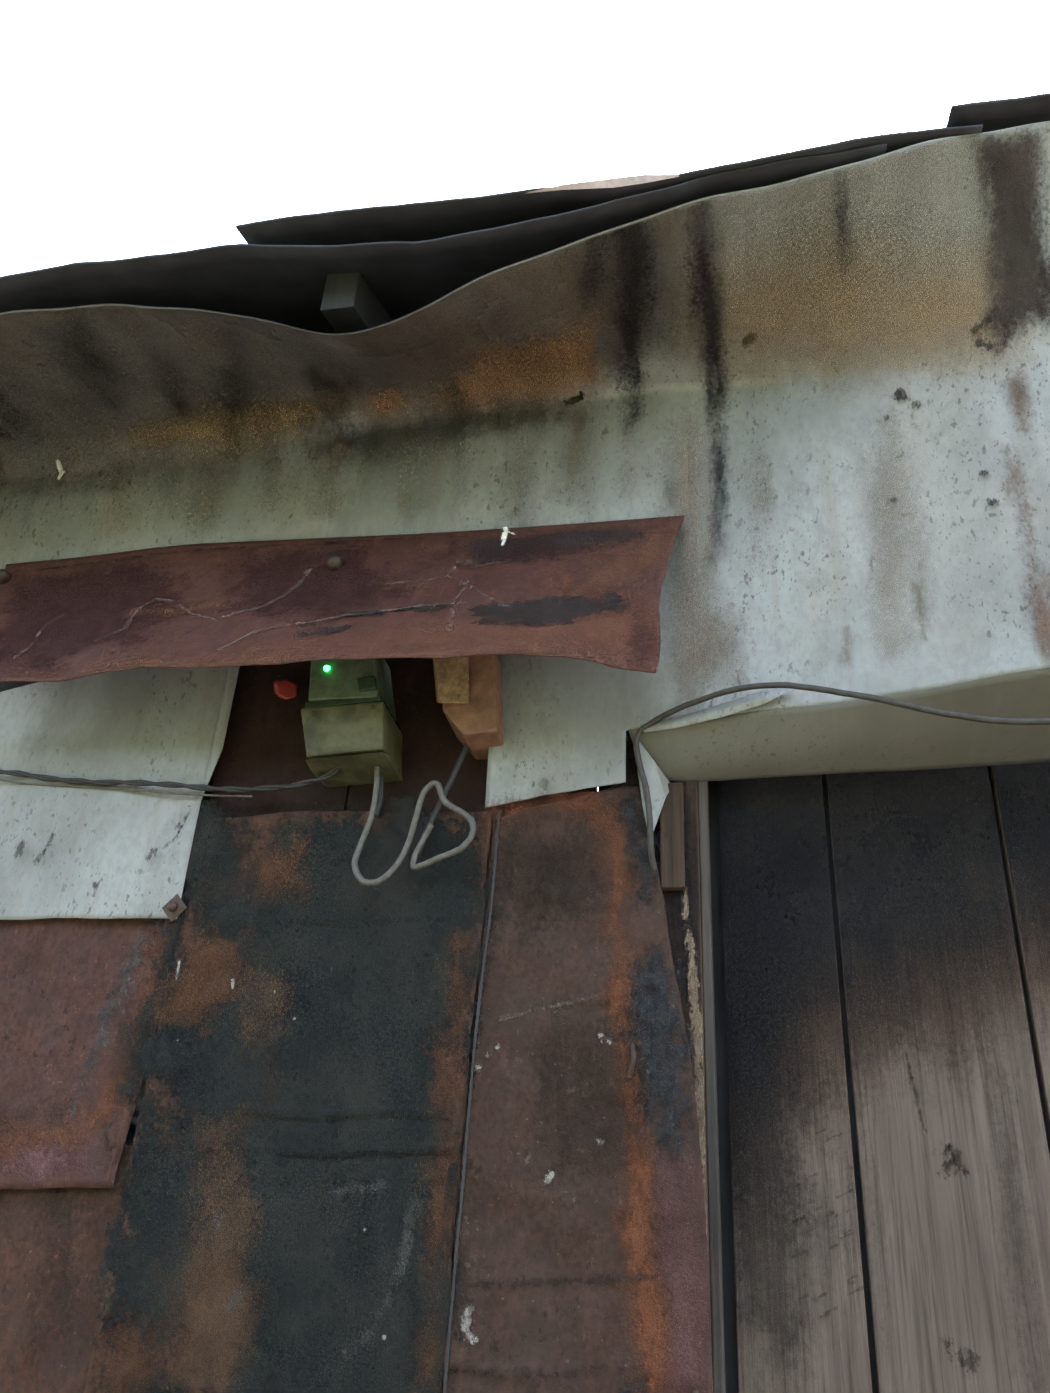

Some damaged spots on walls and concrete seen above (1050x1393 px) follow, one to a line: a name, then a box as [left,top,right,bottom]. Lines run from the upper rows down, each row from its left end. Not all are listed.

leakage [744,133,1050,353]
corrosion [298,603,450,637]
corrosion [465,592,627,627]
corrosion [0,894,184,1393]
corrosion [492,791,678,1393]
leakage [724,889,1050,1280]